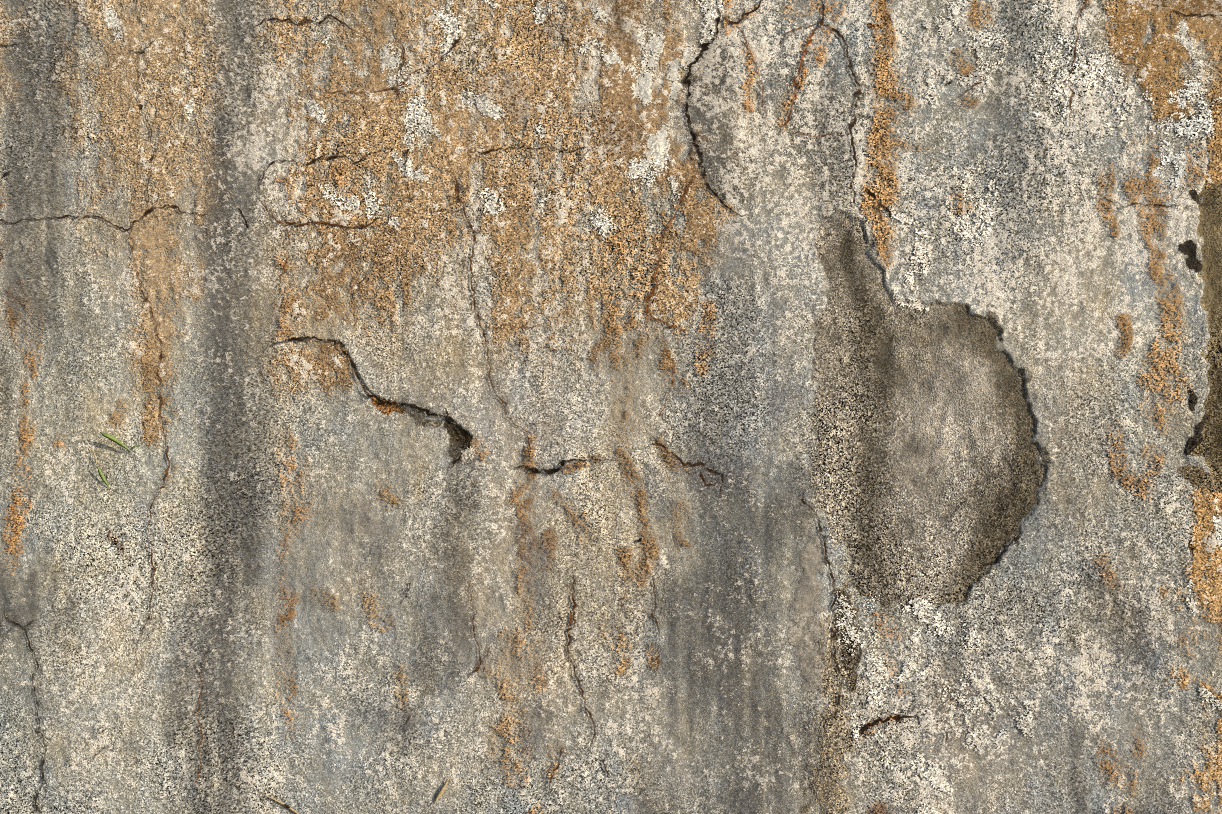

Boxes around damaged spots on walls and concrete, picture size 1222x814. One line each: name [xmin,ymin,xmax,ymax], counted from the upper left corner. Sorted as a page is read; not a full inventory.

crack [4,605,47,814]
crack [0,41,208,678]
crack [238,0,633,483]
crack [463,578,490,682]
peeling [249,0,740,464]
crack [620,551,660,671]
crack [645,0,892,498]
spalling [788,202,1052,814]
peeling [867,0,1019,107]
peeling [946,162,1024,250]
crack [981,535,1019,571]
spalling [1026,0,1222,814]